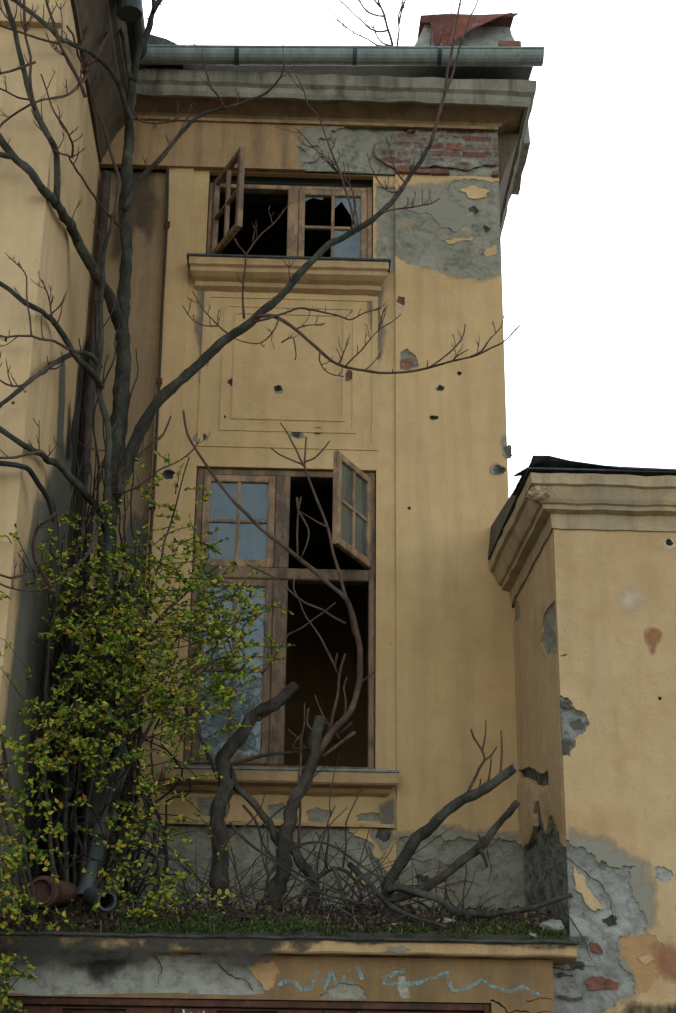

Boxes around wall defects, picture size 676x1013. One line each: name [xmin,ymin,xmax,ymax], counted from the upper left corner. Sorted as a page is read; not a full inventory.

flaking render [297,127,502,280]
damp [196,290,205,350]
damp [0,341,589,980]
flaking render [542,602,557,655]
damp [645,629,661,653]
flaking render [560,696,589,757]
flaking render [521,767,549,786]
flaking render [109,797,214,911]
flaking render [225,803,285,909]
flaking render [281,806,665,1013]
flaking render [0,952,280,996]
crack [490,998,549,1013]